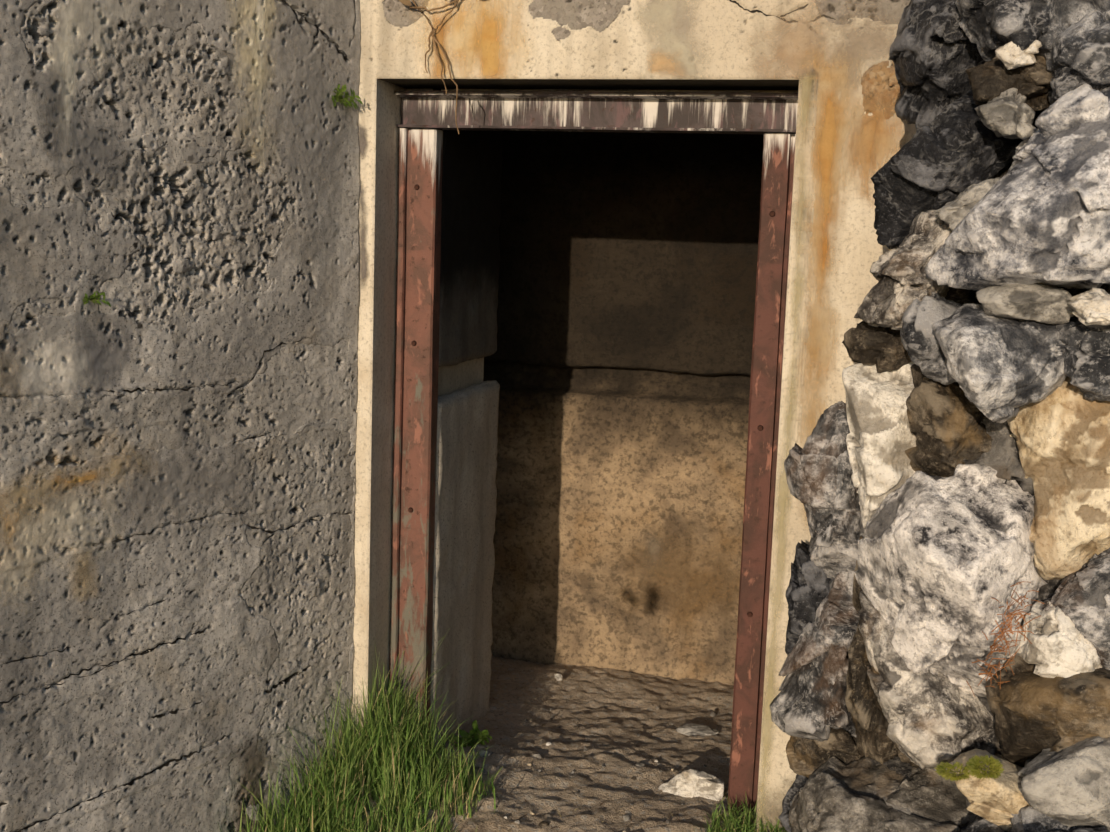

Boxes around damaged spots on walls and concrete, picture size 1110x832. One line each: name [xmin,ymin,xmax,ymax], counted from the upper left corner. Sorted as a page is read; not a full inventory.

crack [277,0,356,61]
spalling [382,0,429,28]
corrosion [432,0,502,76]
spalling [529,0,631,41]
crack [729,0,844,35]
spalling [815,0,911,25]
spalling [861,61,901,119]
corrosion [804,58,896,380]
crack [0,337,308,399]
crack [55,512,352,549]
crack [0,628,207,704]
crack [16,734,231,832]